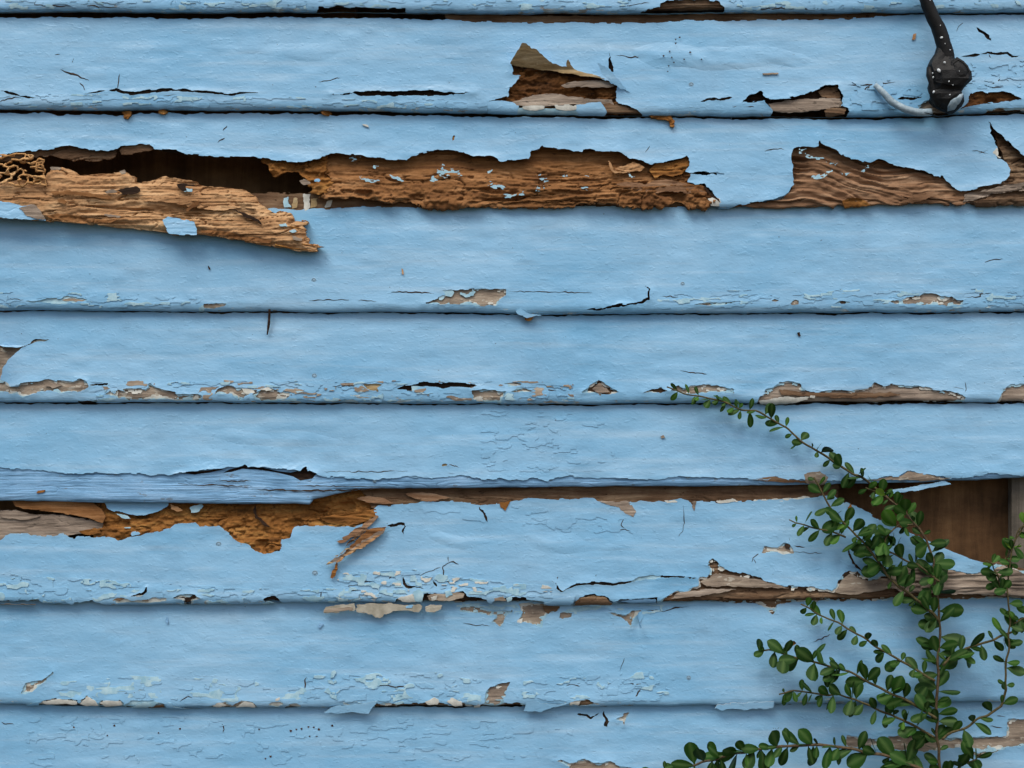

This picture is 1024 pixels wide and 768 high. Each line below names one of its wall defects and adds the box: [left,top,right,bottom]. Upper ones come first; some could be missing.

peeling [283,179,332,211]
peeling [430,164,462,182]
peeling [487,170,548,198]
peeling [799,149,869,179]
peeling [426,288,506,308]
peeling [0,339,618,404]
peeling [757,381,966,405]
crack [178,470,403,492]
peeling [855,471,1024,497]
peeling [0,464,841,536]
peeling [854,519,996,579]
peeling [0,569,665,628]